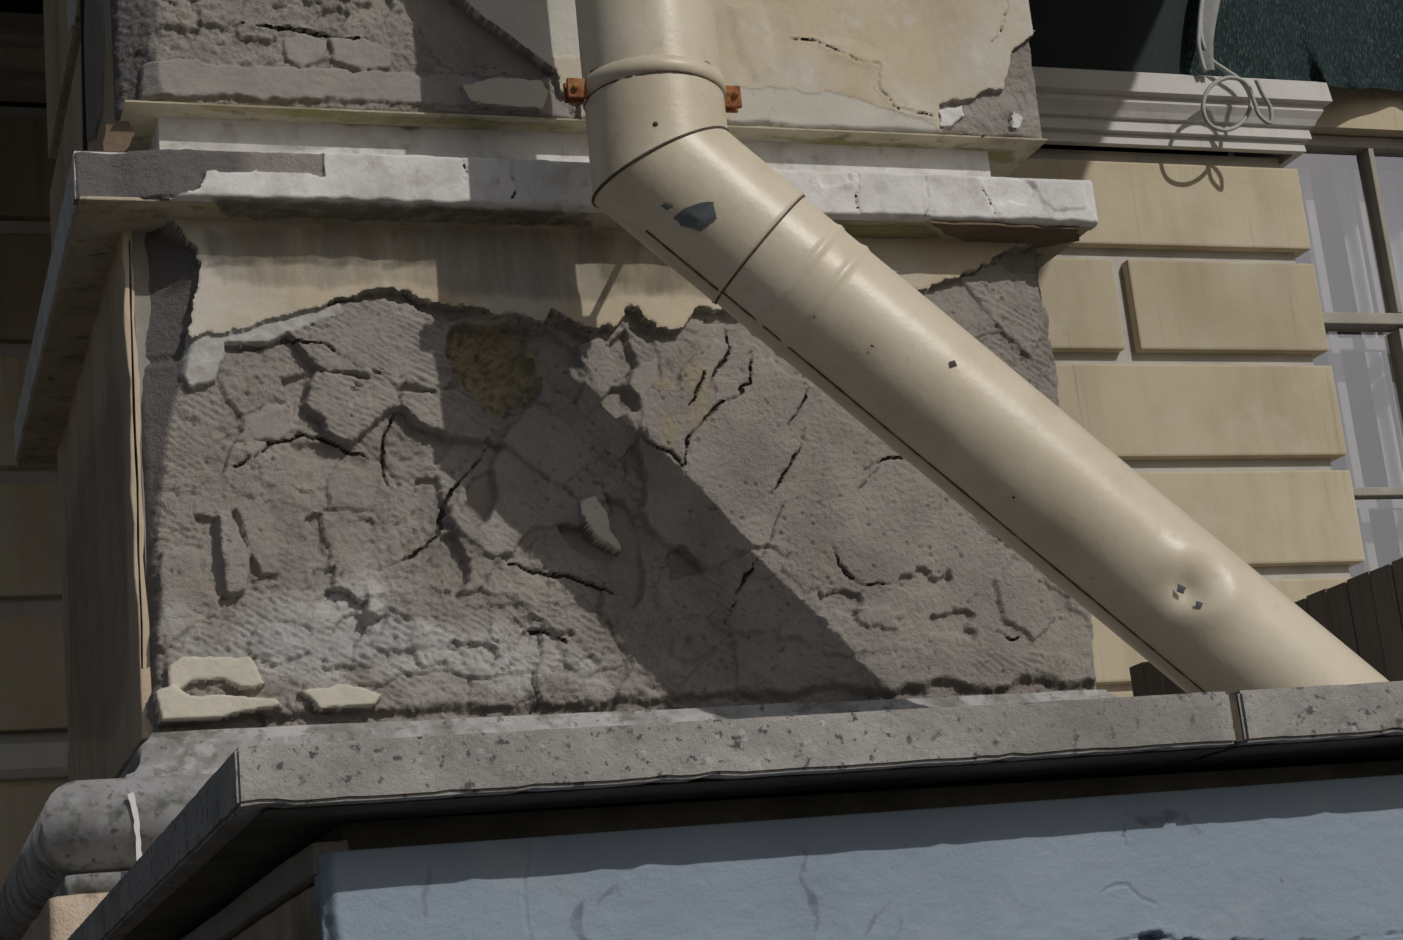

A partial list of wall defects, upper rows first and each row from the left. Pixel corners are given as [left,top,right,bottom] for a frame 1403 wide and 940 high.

flaking render [72,0,582,205]
peeling [730,33,1042,158]
peeling [661,202,717,231]
crack [656,336,753,467]
crack [233,418,393,486]
flaking render [140,220,1096,742]
crack [777,453,797,486]
crack [403,482,460,560]
crack [507,562,609,592]
crack [835,554,886,587]
crack [527,629,567,644]
crack [1138,930,1196,940]